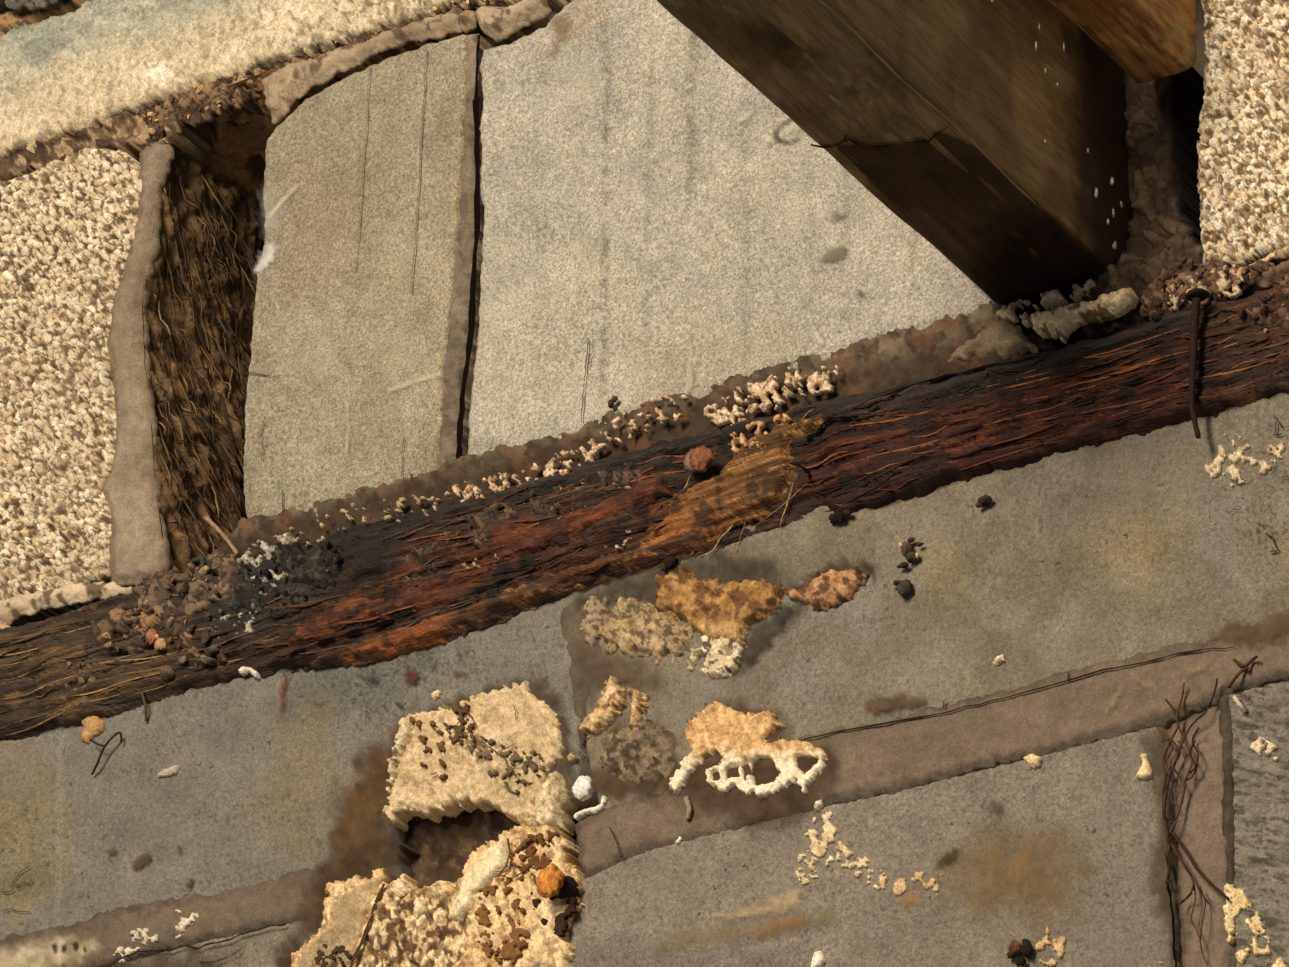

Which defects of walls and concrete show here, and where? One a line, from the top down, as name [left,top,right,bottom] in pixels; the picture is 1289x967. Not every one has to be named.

leakage [275,725,400,967]
spalling [291,675,943,967]